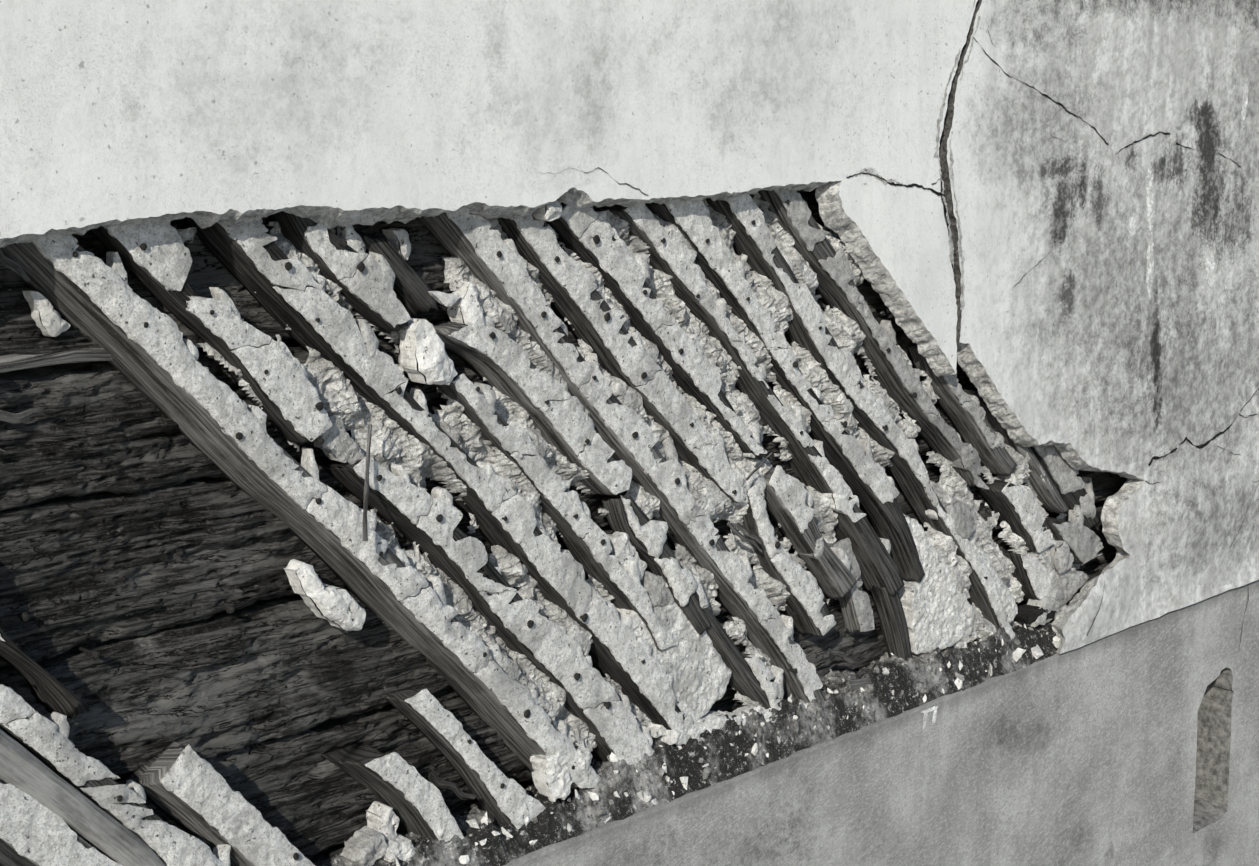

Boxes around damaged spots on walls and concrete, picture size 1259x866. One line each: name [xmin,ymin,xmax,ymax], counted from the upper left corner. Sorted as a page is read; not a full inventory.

spalling [0,205,450,248]
crack [846,0,1242,342]
damp [1060,274,1075,315]
damp [1041,158,1105,243]
damp [1126,145,1183,426]
damp [1190,101,1251,287]
spalling [464,181,1145,653]
crack [1146,389,1259,484]